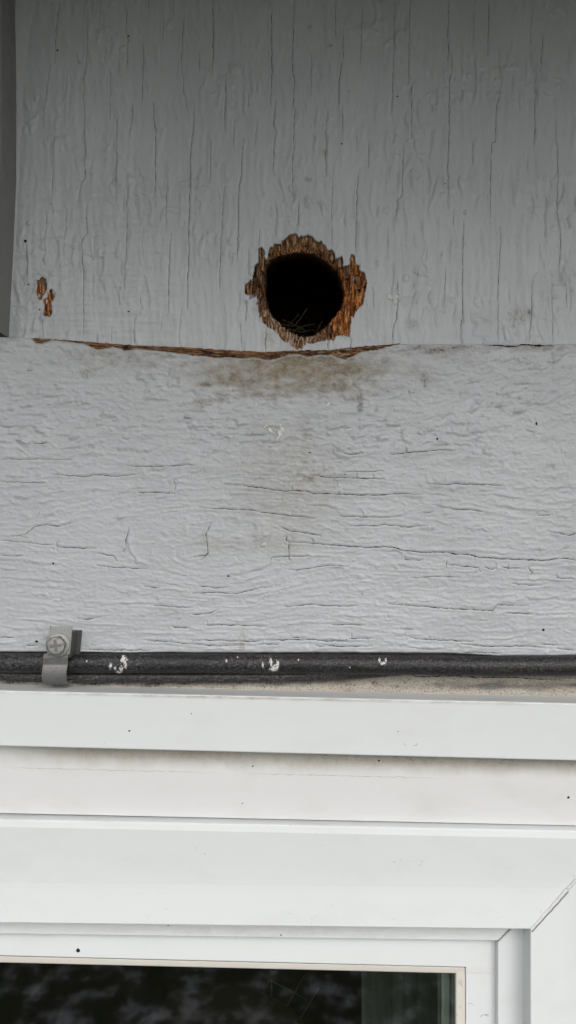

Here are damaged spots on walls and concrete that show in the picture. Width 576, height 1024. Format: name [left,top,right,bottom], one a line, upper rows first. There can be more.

crack [26,0,312,343]
crack [325,12,369,248]
crack [444,2,567,347]
peeling [36,277,55,317]
peeling [33,339,353,361]
crack [1,442,182,494]
crack [1,524,369,651]
crack [198,449,575,681]